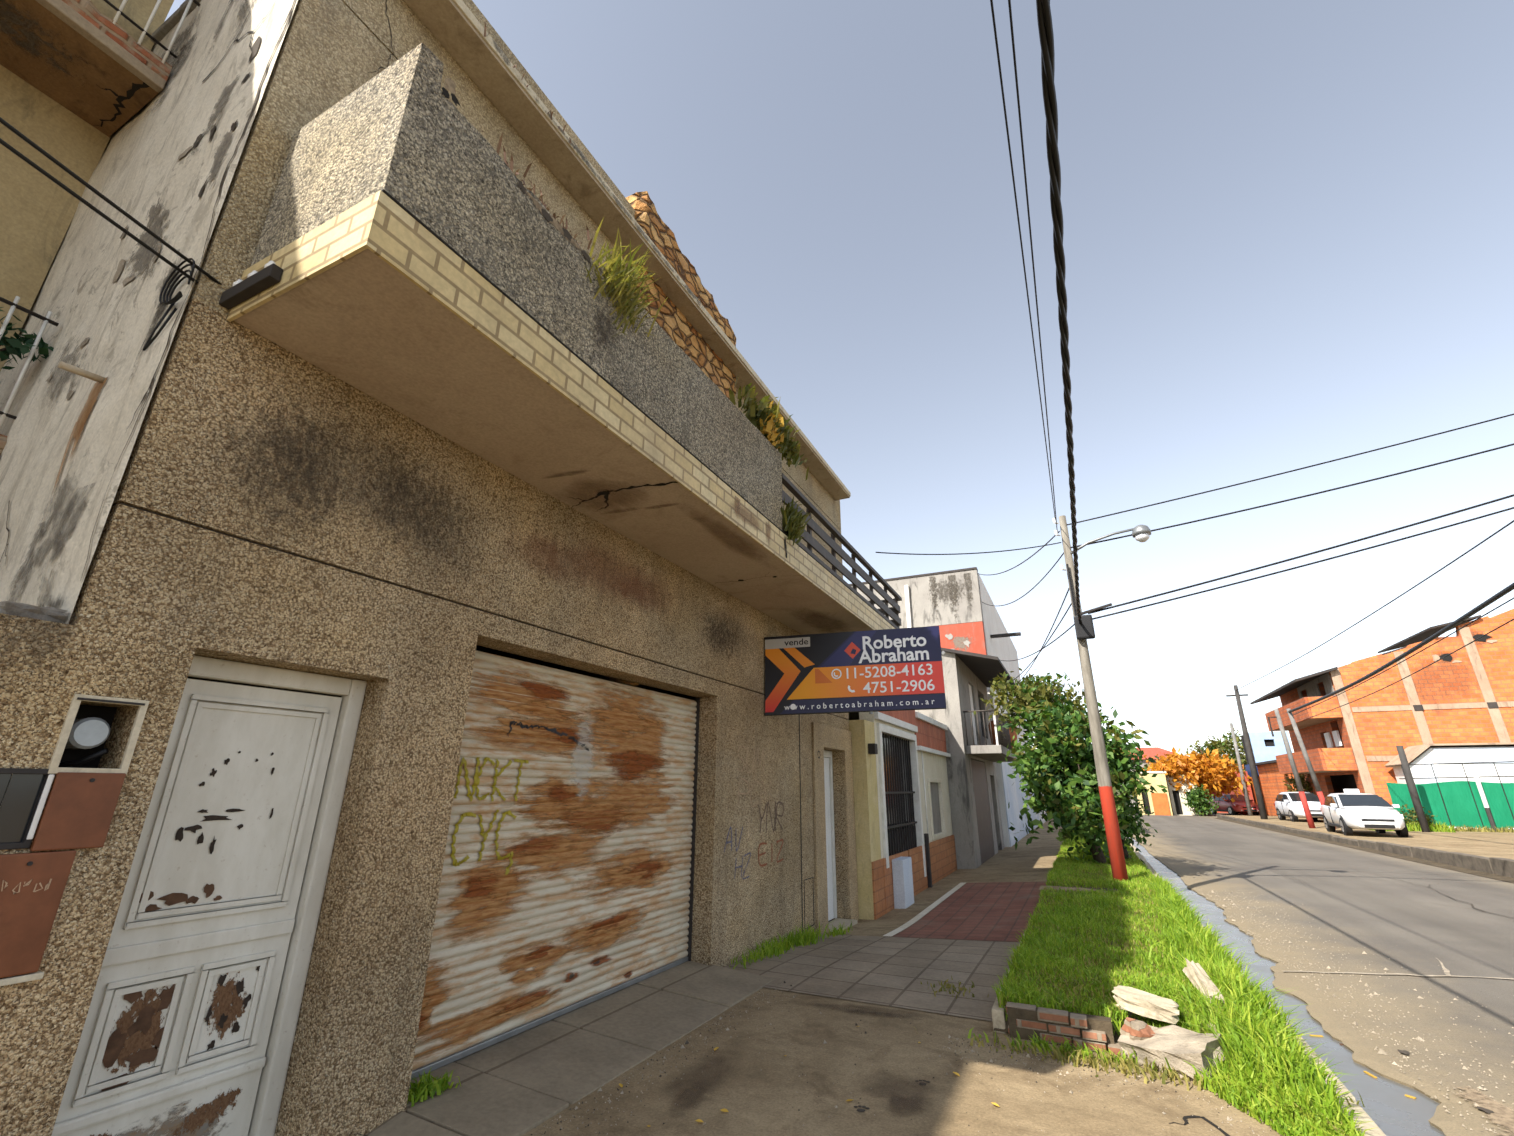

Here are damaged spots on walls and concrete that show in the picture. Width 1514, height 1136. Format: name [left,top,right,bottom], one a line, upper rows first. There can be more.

water stain [147,16,197,112]
water stain [213,0,270,48]
crack [80,0,295,581]
water stain [9,473,93,608]
crack [569,481,678,512]
peeling [175,809,245,854]
corrosion [447,670,678,944]
peeling [101,984,175,1091]
peeling [205,966,260,1050]
corrosion [414,908,646,1059]
peeling [90,1088,242,1136]
crack [1171,1115,1230,1136]